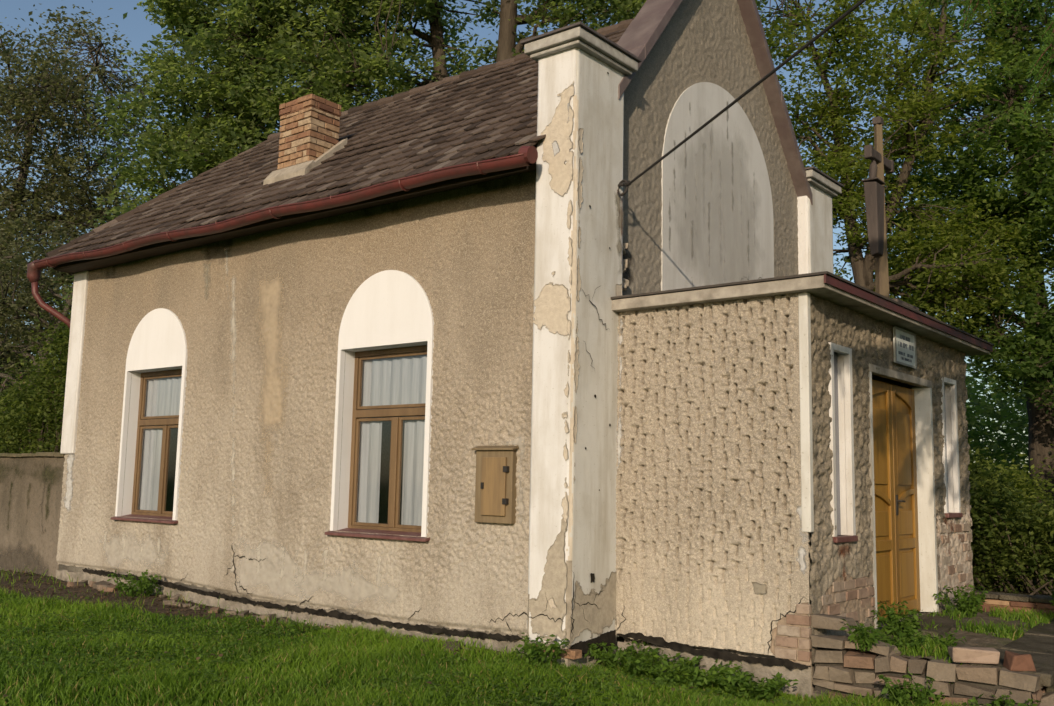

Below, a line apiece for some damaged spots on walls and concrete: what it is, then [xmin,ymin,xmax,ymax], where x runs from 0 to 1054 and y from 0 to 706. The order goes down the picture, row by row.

crack [82,543,808,670]
peeling [528,81,617,660]